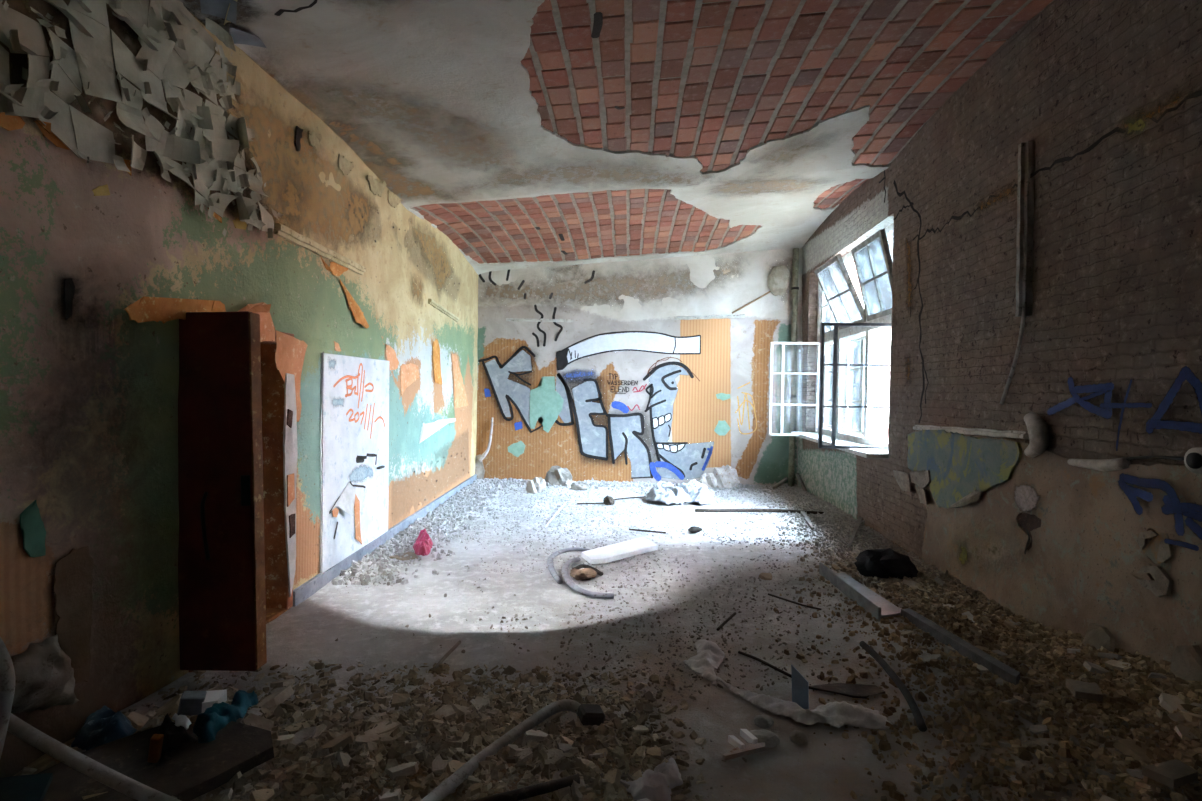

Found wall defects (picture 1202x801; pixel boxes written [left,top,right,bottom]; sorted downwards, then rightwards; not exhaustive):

crack [274,0,317,16]
peeling [0,0,284,238]
spalling [294,126,322,151]
spalling [521,0,1053,209]
spalling [348,175,761,264]
crack [879,90,1202,423]
peeling [893,430,1041,554]